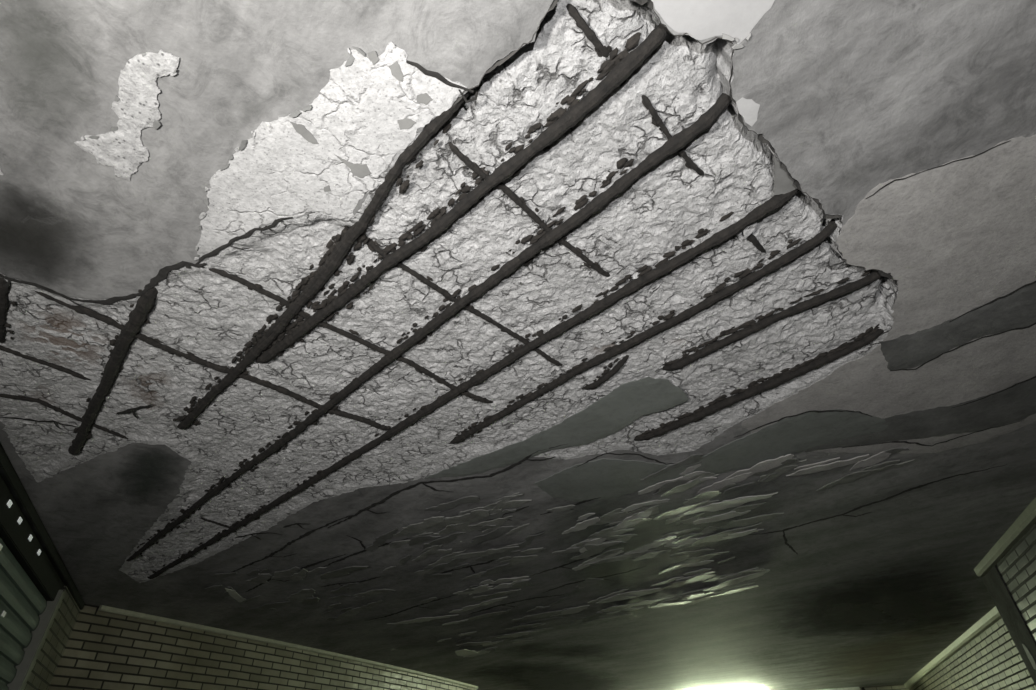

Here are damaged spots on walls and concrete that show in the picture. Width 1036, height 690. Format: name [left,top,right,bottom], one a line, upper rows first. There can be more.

peeling [74,49,180,181]
spalling [126,0,1036,579]
spalling [0,277,389,583]
crack [232,444,566,592]
crack [366,554,645,621]
crack [486,497,601,521]
peeling [455,414,1036,658]
crack [749,464,1007,555]